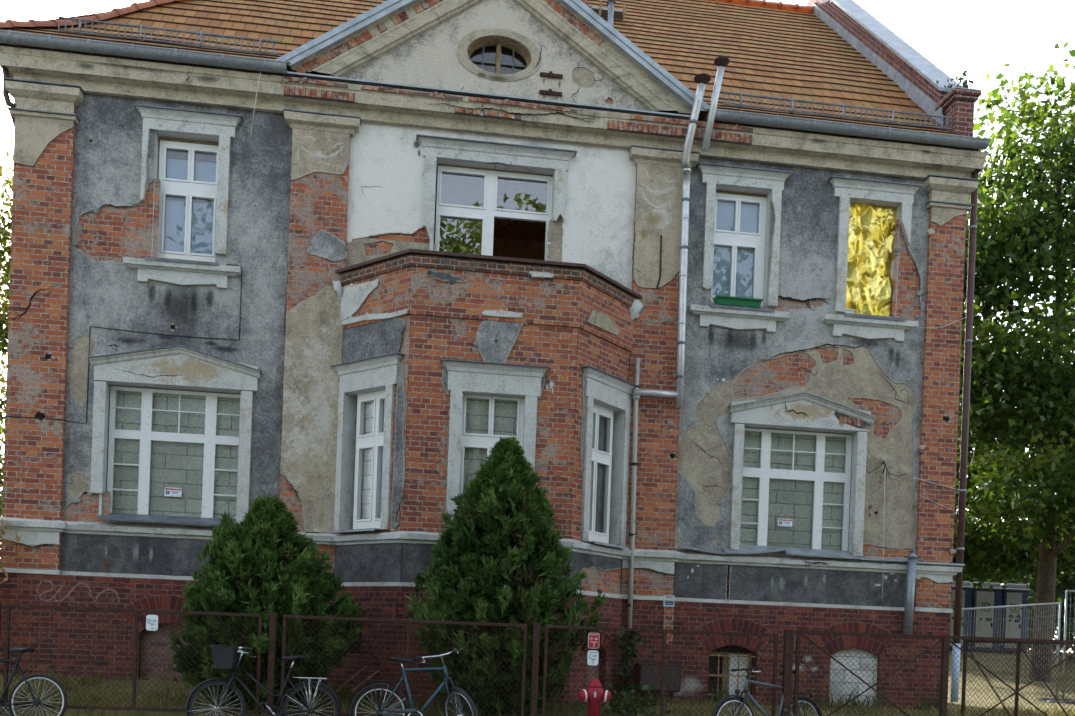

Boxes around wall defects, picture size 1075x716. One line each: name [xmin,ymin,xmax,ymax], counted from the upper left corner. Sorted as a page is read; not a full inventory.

flaking render [572,67,613,104]
flaking render [607,115,753,145]
crack [12,289,52,320]
damp [149,288,212,315]
flaking render [0,128,161,570]
flaking render [286,164,436,531]
flaking render [473,309,528,363]
flaking render [441,363,449,395]
flaking render [581,215,966,609]
flaking render [280,474,305,532]